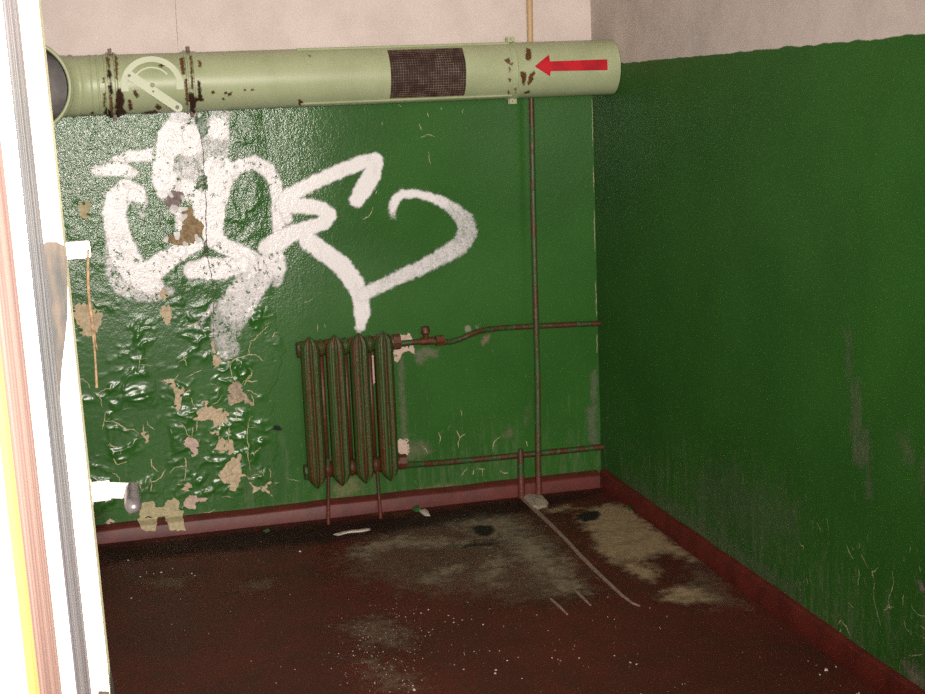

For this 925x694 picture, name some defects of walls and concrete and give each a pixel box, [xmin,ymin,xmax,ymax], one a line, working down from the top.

peeling [195,169,208,192]
peeling [162,190,204,247]
crack [189,132,215,338]
peeling [73,302,103,337]
peeling [158,288,172,325]
peeling [393,333,415,362]
peeling [161,379,191,411]
crack [83,327,297,490]
peeling [182,436,200,457]
peeling [193,382,272,496]
peeling [398,438,410,455]
peeling [137,483,211,531]